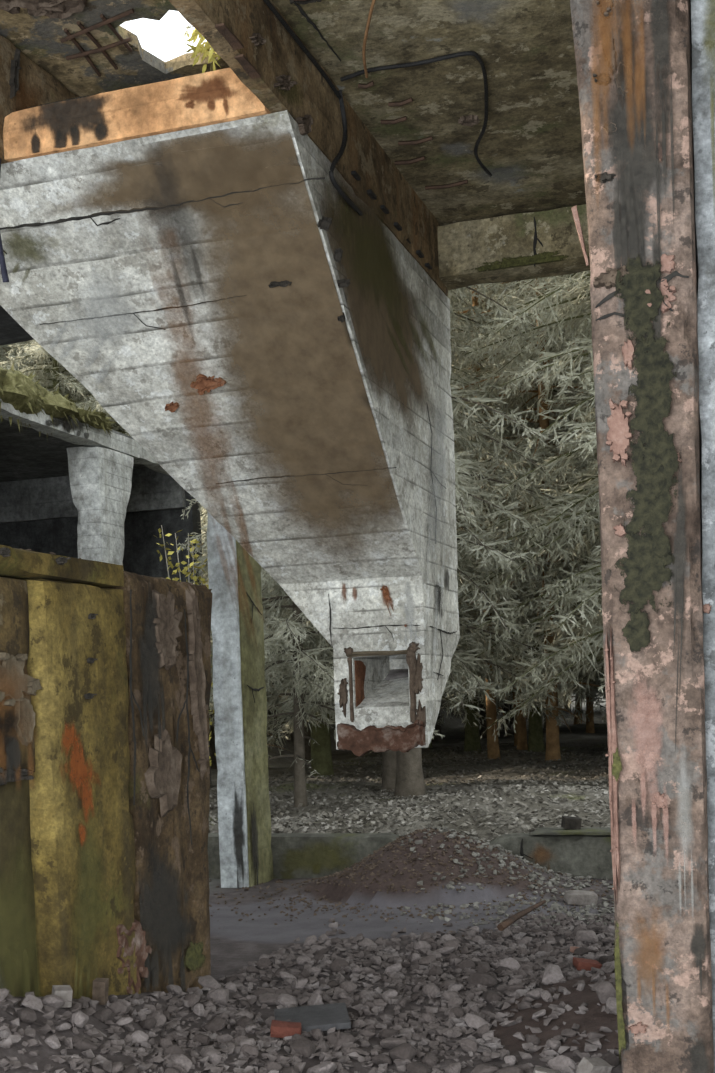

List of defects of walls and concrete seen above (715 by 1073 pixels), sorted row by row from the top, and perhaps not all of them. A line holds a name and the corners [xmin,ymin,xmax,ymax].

rust [179,78,231,113]
leakage [79,130,438,554]
peeling [621,339,635,370]
leakage [46,415,89,439]
peeling [606,399,633,467]
peeling [613,523,627,537]
peeling [0,652,42,746]
rust [62,724,99,845]